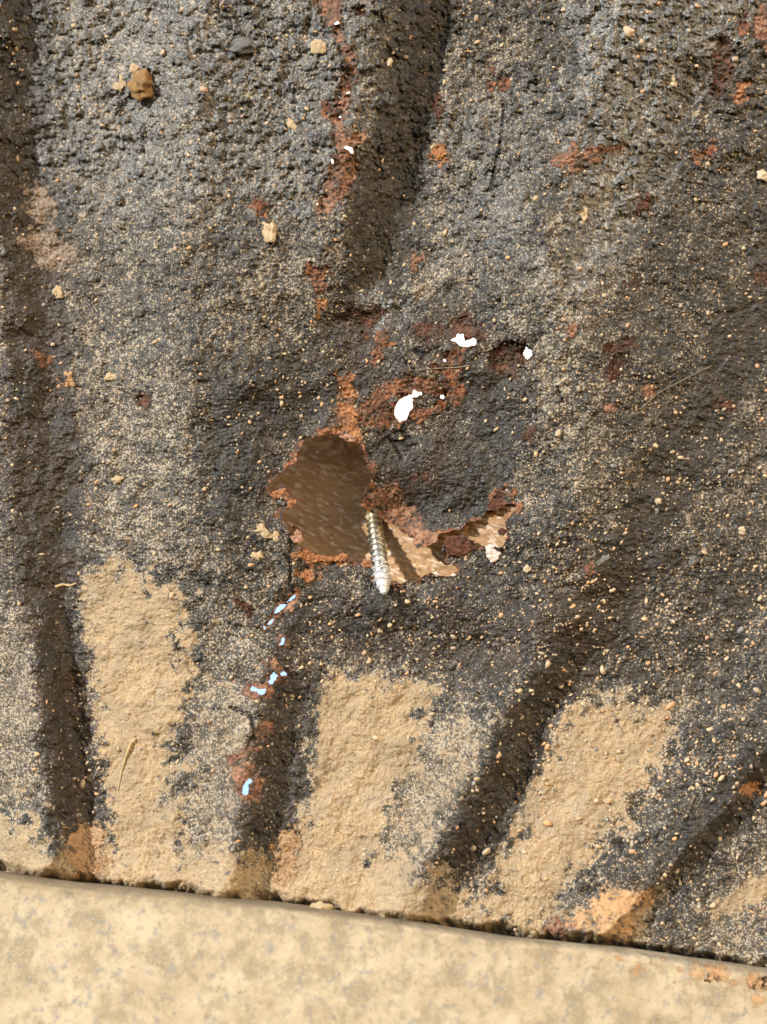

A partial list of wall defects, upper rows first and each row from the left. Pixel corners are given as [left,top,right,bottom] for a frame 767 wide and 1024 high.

spalling [489,338,530,379]
peeling [270,483,296,508]
peeling [290,526,348,565]
peeling [486,527,507,562]
damp [63,821,113,884]
damp [269,824,308,885]